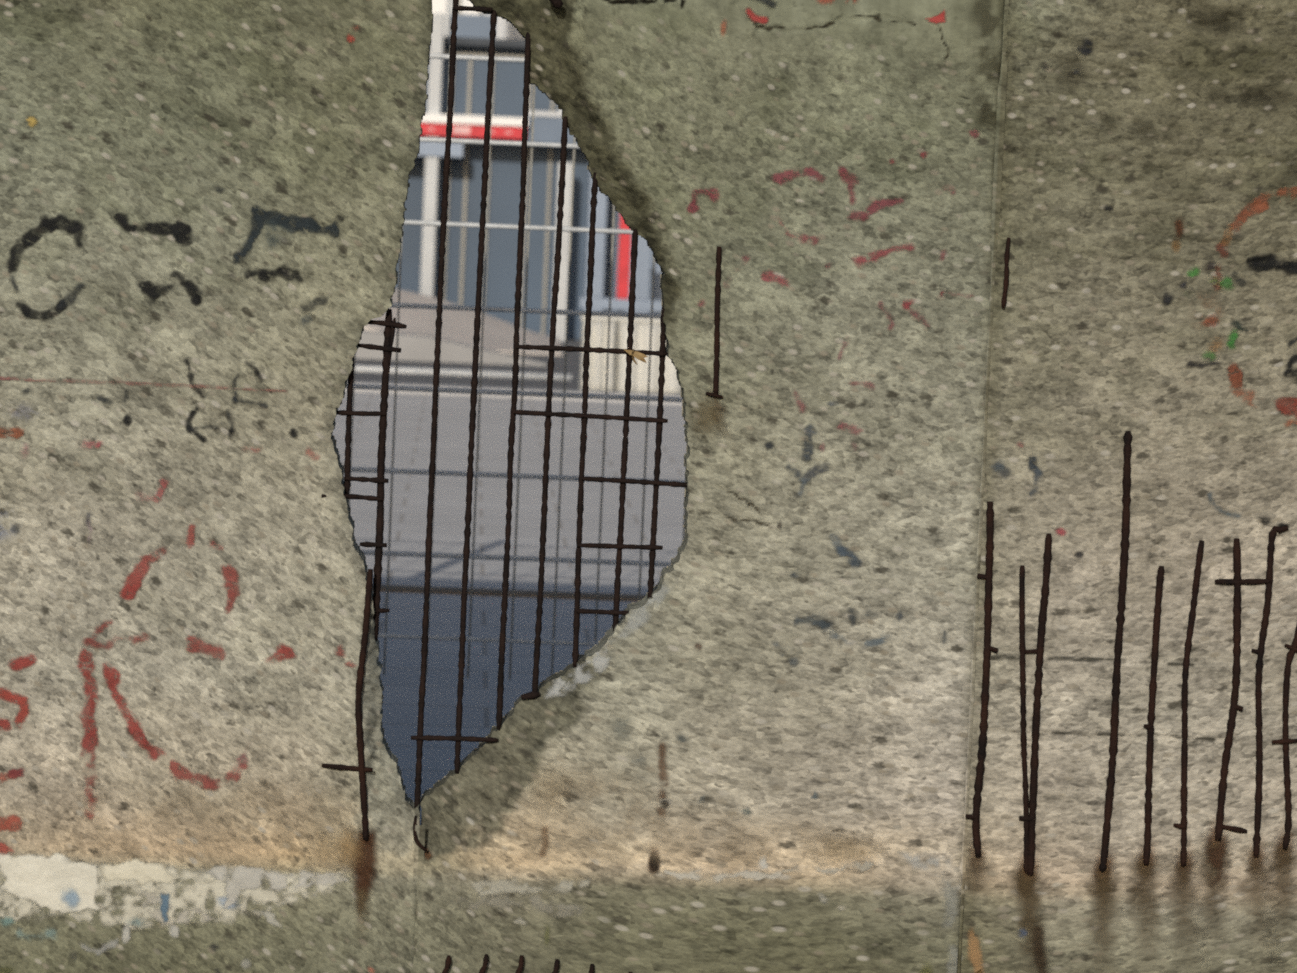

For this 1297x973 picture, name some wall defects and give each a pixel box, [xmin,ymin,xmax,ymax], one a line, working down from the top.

crack [606,0,685,8]
crack [754,15,948,59]
spalling [1021,0,1297,52]
spalling [1001,237,1011,308]
spalling [322,0,687,861]
corrosion [658,744,668,815]
corrosion [354,833,375,908]
corrosion [540,828,548,855]
corrosion [649,852,659,872]
corrosion [1135,859,1154,910]
corrosion [1205,835,1224,891]
corrosion [1252,845,1292,886]